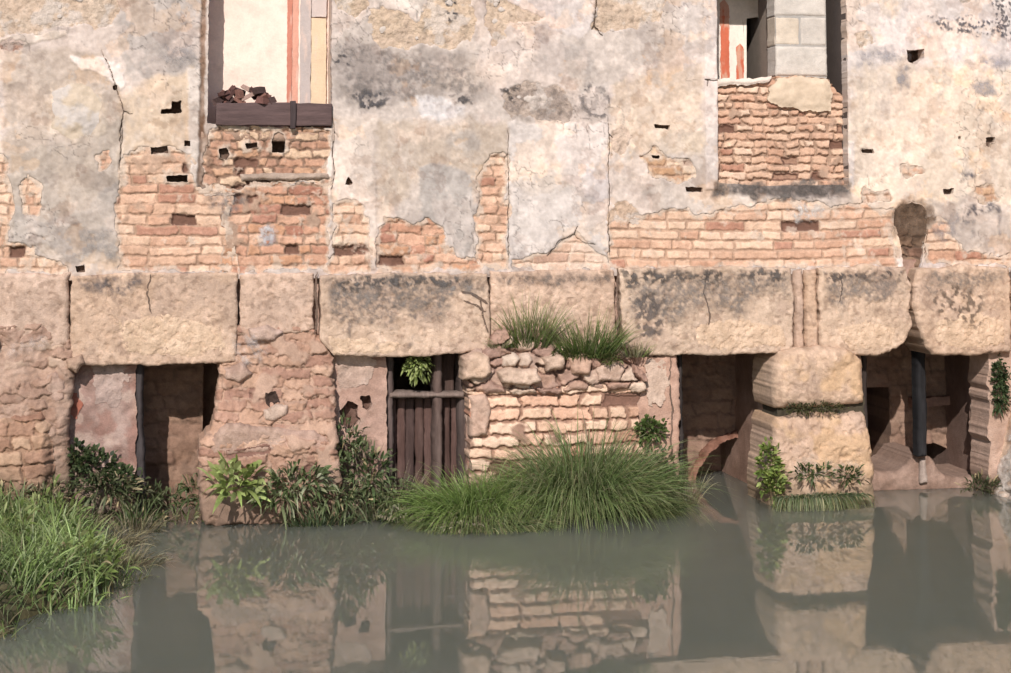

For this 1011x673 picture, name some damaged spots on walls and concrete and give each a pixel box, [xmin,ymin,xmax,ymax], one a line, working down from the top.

crack [102,53,132,163]
mould [356,89,386,109]
flaking render [0,154,85,275]
flaking render [94,125,898,275]
flaking render [924,216,1011,268]
flaking render [974,183,1000,205]